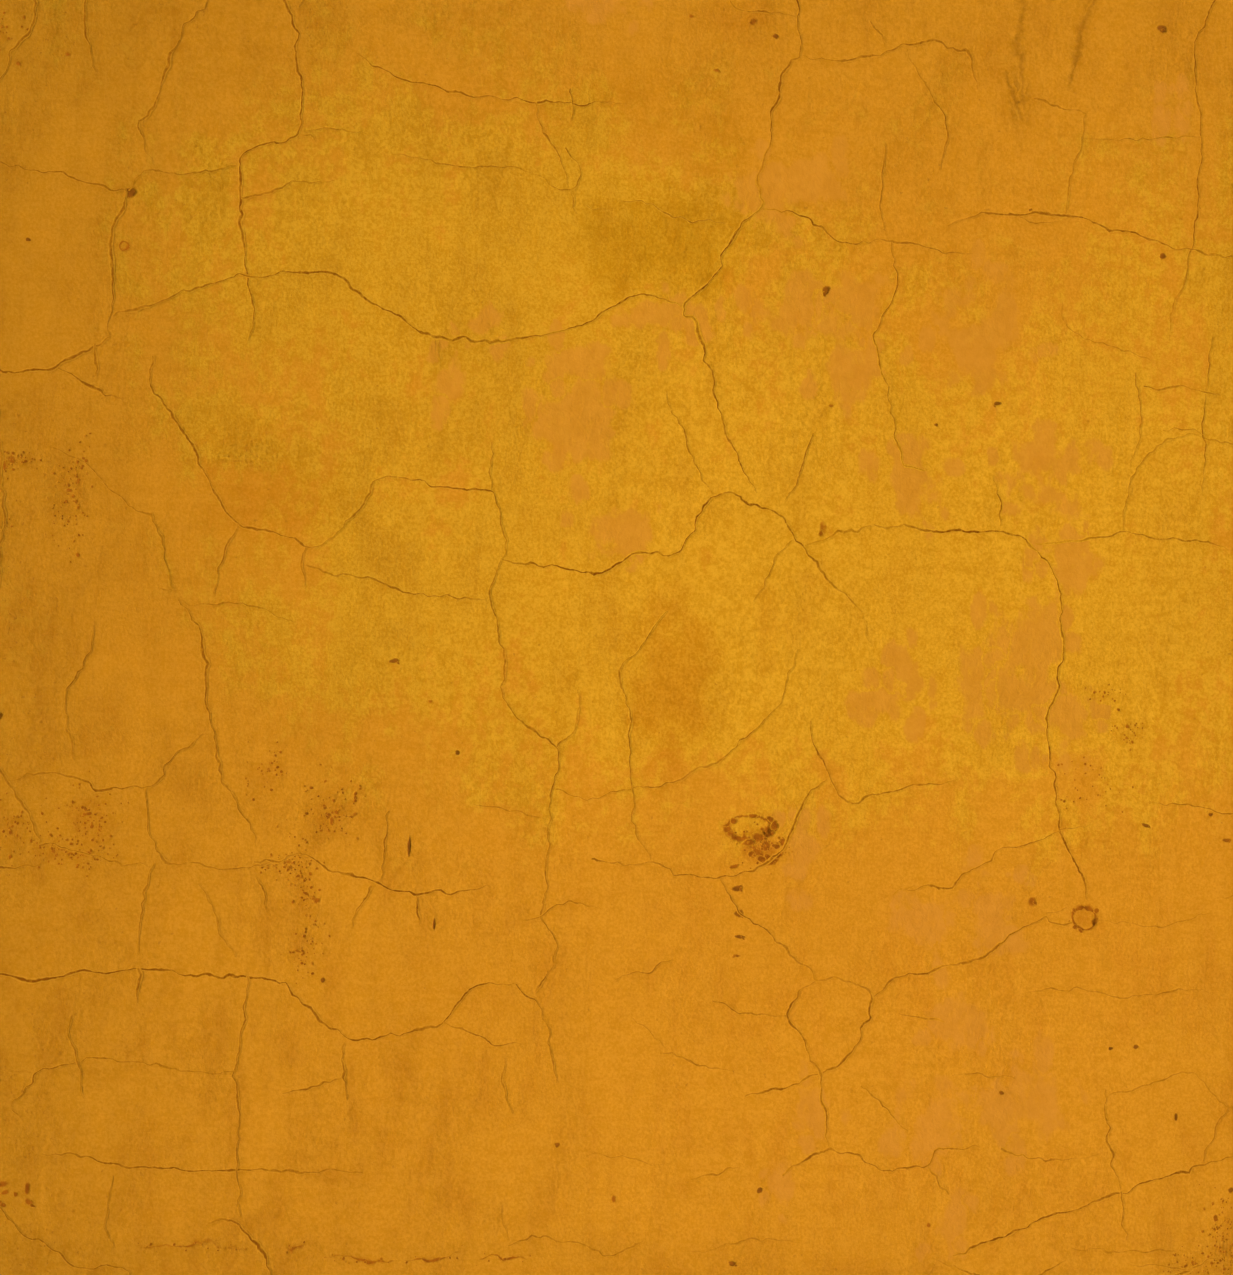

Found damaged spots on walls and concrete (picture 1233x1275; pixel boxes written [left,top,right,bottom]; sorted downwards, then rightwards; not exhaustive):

crack [0,0,979,493]
crack [948,0,1233,340]
crack [0,336,1233,1275]
rust [722,814,794,875]
rust [1068,903,1099,933]